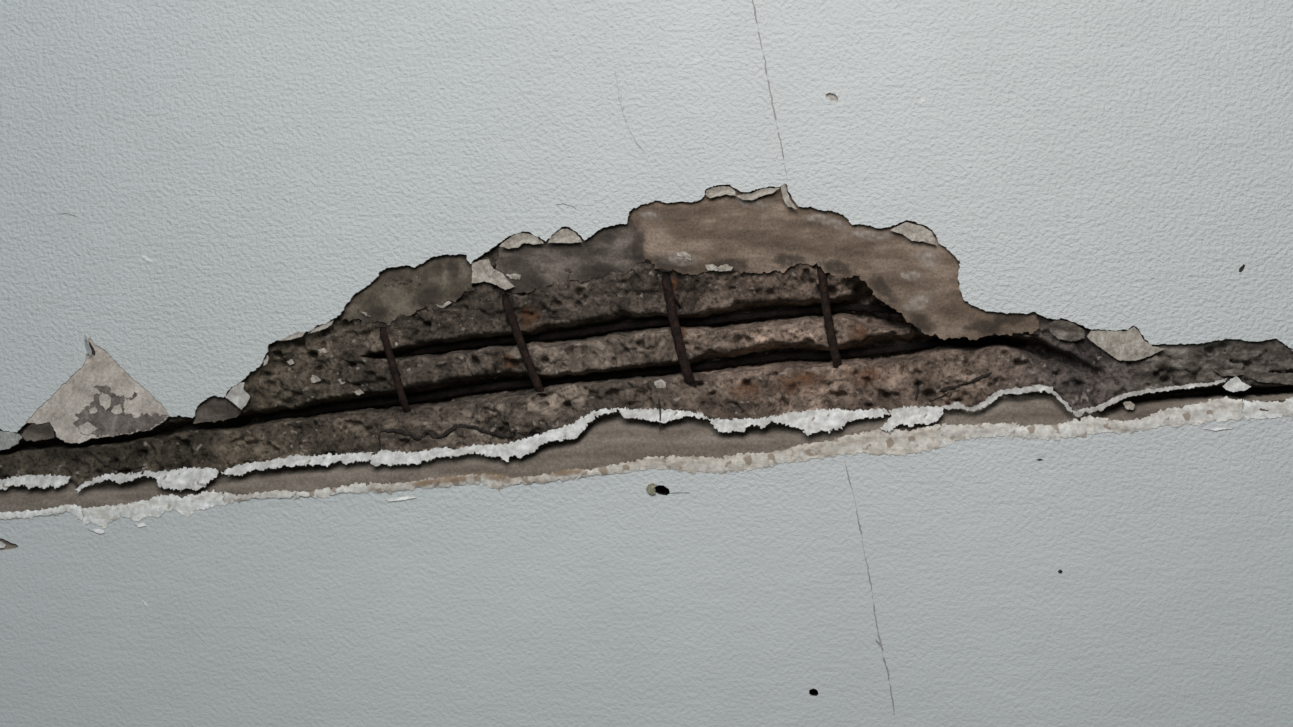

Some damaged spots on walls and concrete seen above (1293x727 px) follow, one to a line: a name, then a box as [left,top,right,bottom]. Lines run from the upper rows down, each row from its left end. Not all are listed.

crack [752,0,788,182]
spalling [0,184,1293,534]
crack [845,463,894,710]